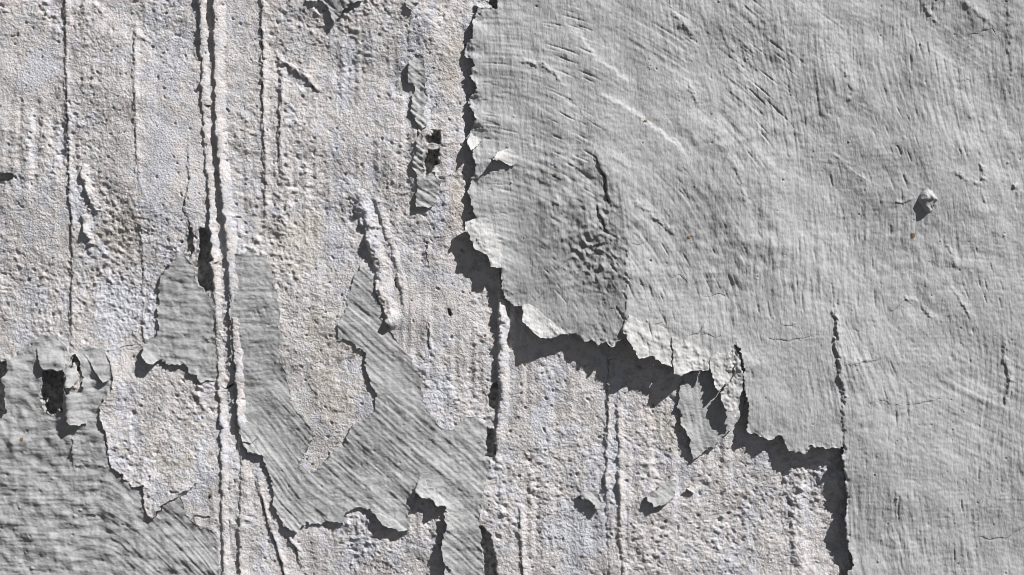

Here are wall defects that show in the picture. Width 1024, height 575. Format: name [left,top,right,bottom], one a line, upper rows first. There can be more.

spalling [0,172,16,186]
crack [260,0,319,215]
peeling [306,0,363,24]
peeling [407,53,441,208]
peeling [464,0,1024,575]
peeling [0,333,220,575]
peeling [141,220,500,575]